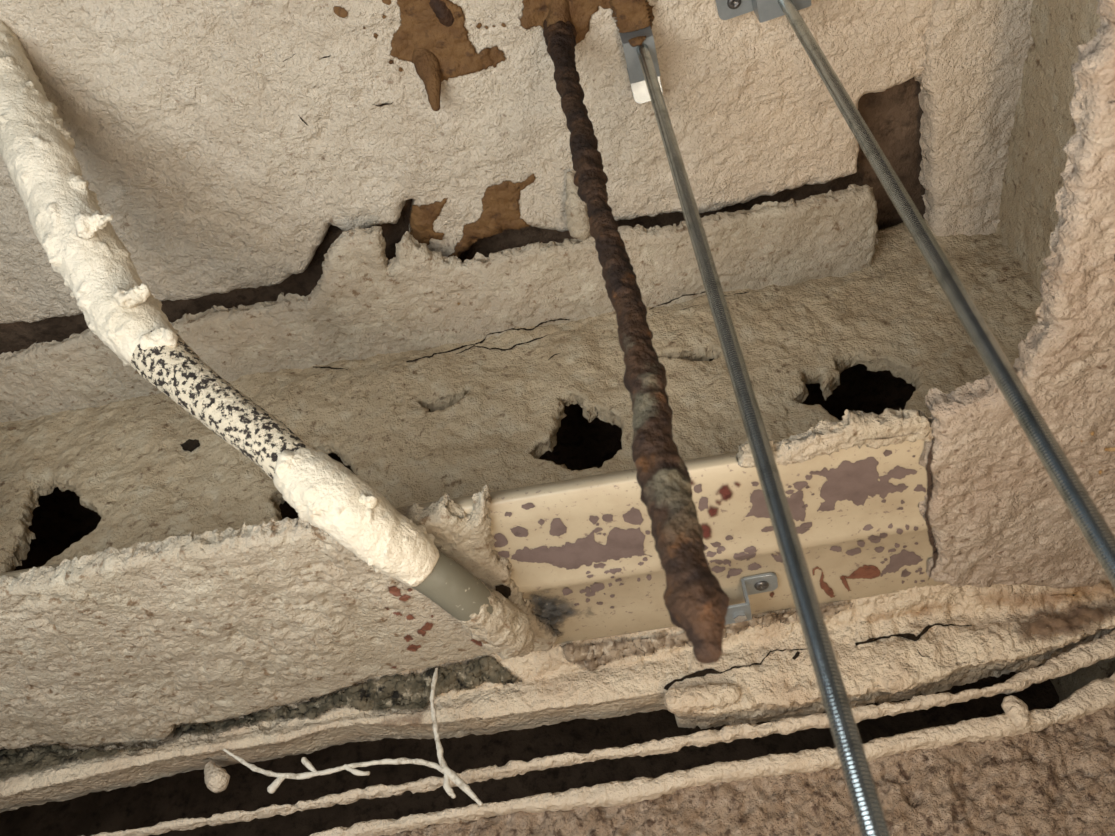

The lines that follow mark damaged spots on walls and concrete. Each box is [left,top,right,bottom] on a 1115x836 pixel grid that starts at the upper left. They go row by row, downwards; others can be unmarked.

rust [518,0,654,47]
rust [382,0,506,111]
rust [409,198,448,245]
rust [448,174,535,257]
crack [649,291,748,310]
crack [406,318,570,362]
peeling [785,450,926,534]
peeling [494,503,652,609]
peeling [830,523,925,584]
spalling [561,632,693,671]
crack [664,649,806,690]
crack [855,623,972,657]